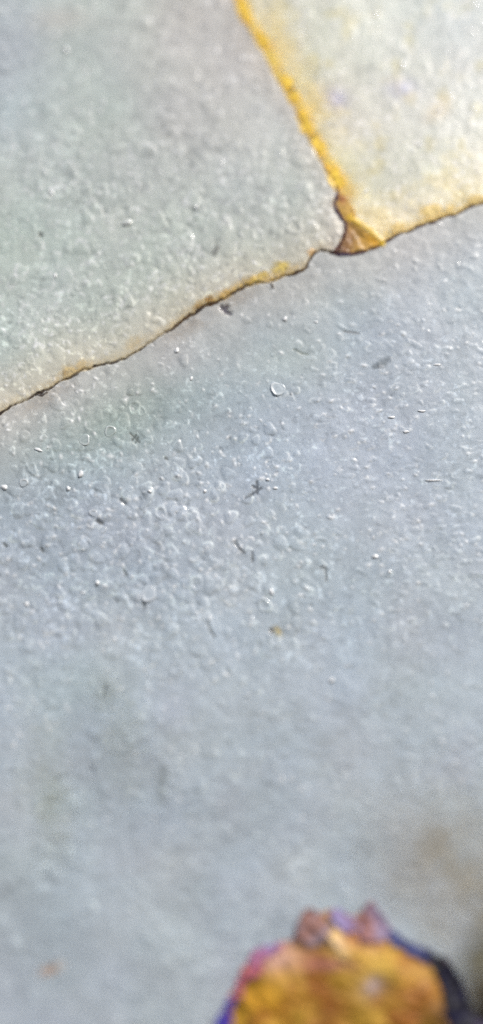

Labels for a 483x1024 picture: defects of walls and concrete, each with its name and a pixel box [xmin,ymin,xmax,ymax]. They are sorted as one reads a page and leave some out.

crack [0,37,483,415]
corrosion [196,262,294,308]
corrosion [236,0,354,235]
spalling [329,192,385,256]